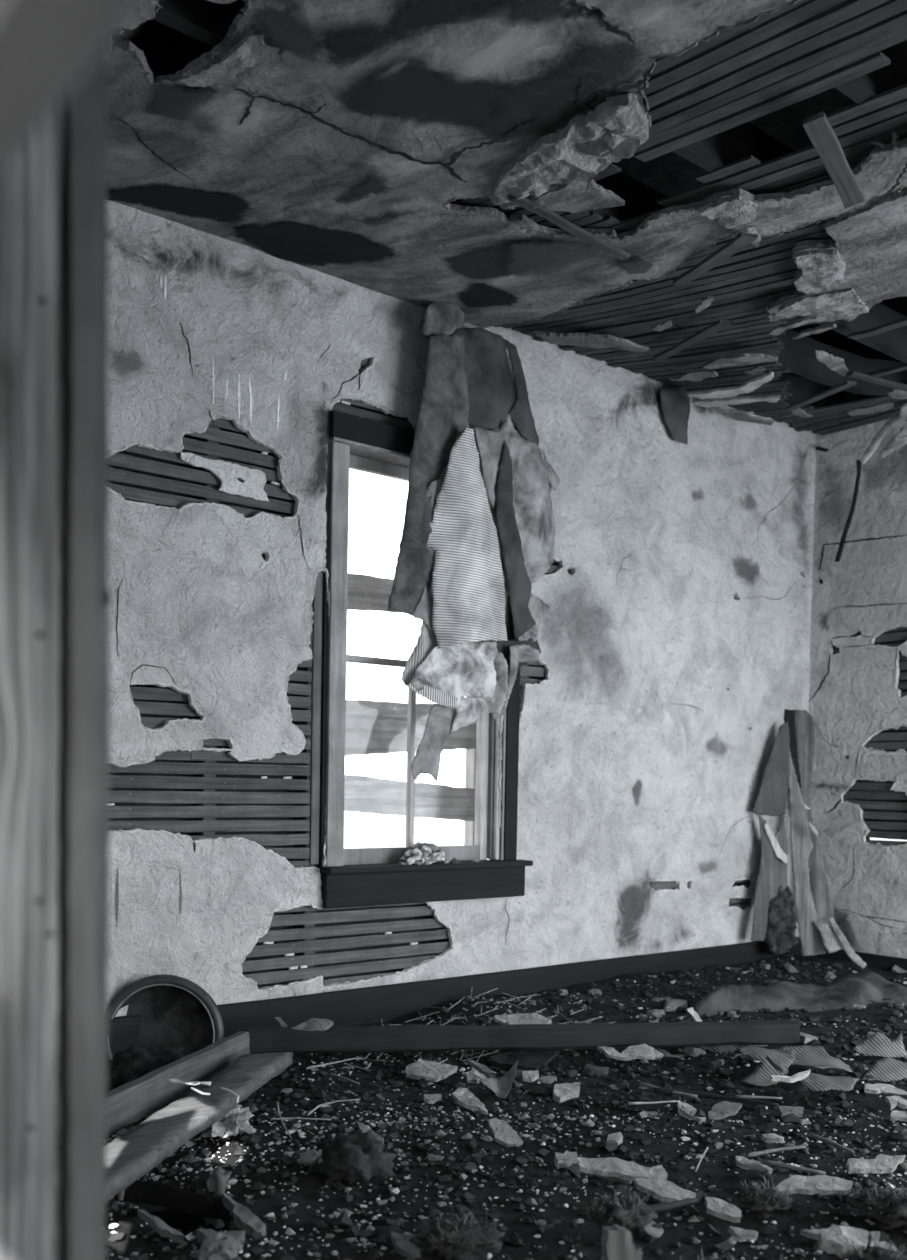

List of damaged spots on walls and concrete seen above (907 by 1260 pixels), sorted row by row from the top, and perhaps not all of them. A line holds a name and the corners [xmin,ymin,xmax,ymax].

crack [250,24,286,55]
damp [256,0,641,141]
crack [566,0,635,43]
flaking render [634,0,907,162]
crack [181,88,544,182]
damp [108,184,420,266]
damp [445,238,609,309]
flaking render [494,186,907,436]
crack [334,372,361,398]
flaking render [109,413,453,991]
flaking render [840,724,907,848]
damp [617,872,653,947]